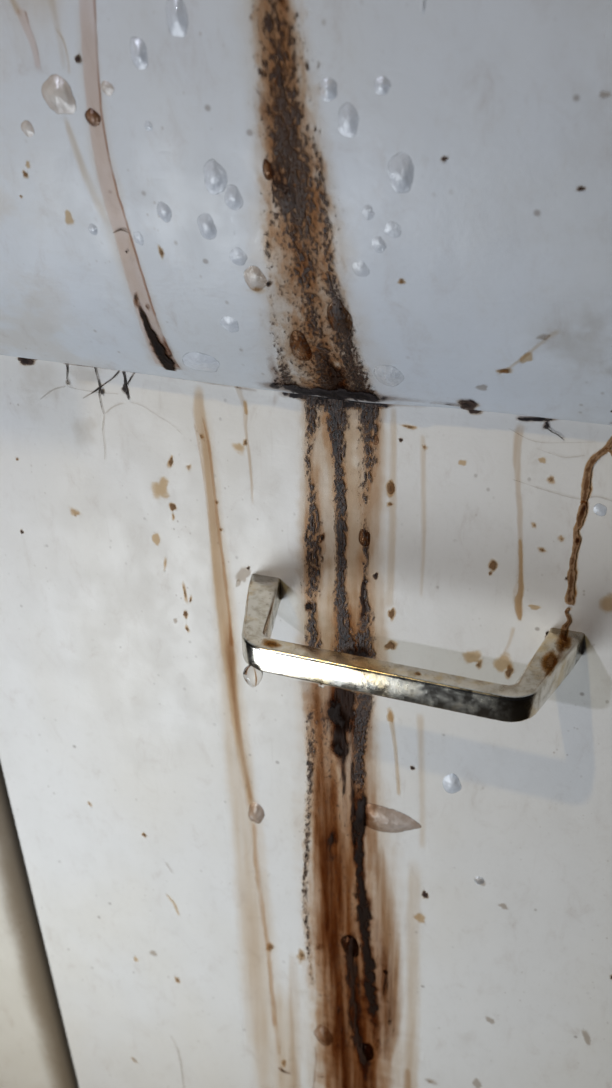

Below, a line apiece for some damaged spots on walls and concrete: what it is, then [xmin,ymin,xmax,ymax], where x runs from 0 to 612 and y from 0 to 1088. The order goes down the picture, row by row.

crack [66,364,132,407]
rust [252,0,394,659]
rust [543,437,612,671]
rust [301,686,394,1081]